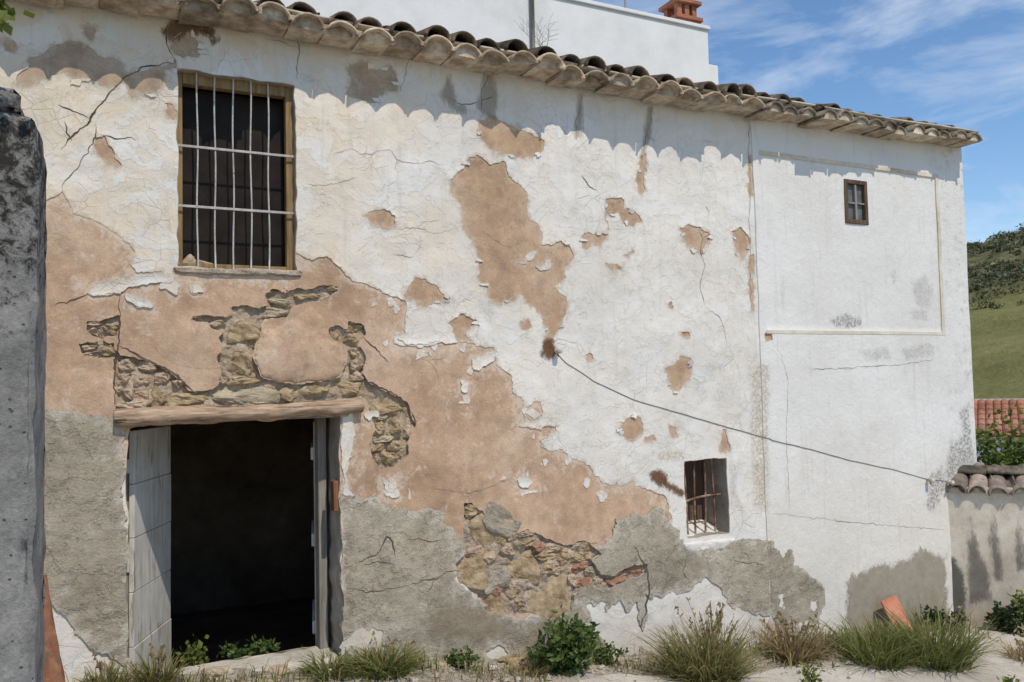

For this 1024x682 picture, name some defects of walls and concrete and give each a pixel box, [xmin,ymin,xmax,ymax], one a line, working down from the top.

crack [58,22,177,190]
flaking render [95,136,122,167]
flaking render [636,154,647,194]
flaking render [451,116,641,341]
flaking render [680,224,713,255]
flaking render [732,227,754,310]
flaking render [45,192,672,561]
flaking render [665,356,694,393]
crack [812,360,928,370]
crack [353,536,458,593]
crack [611,546,650,627]
leakage [845,547,966,632]